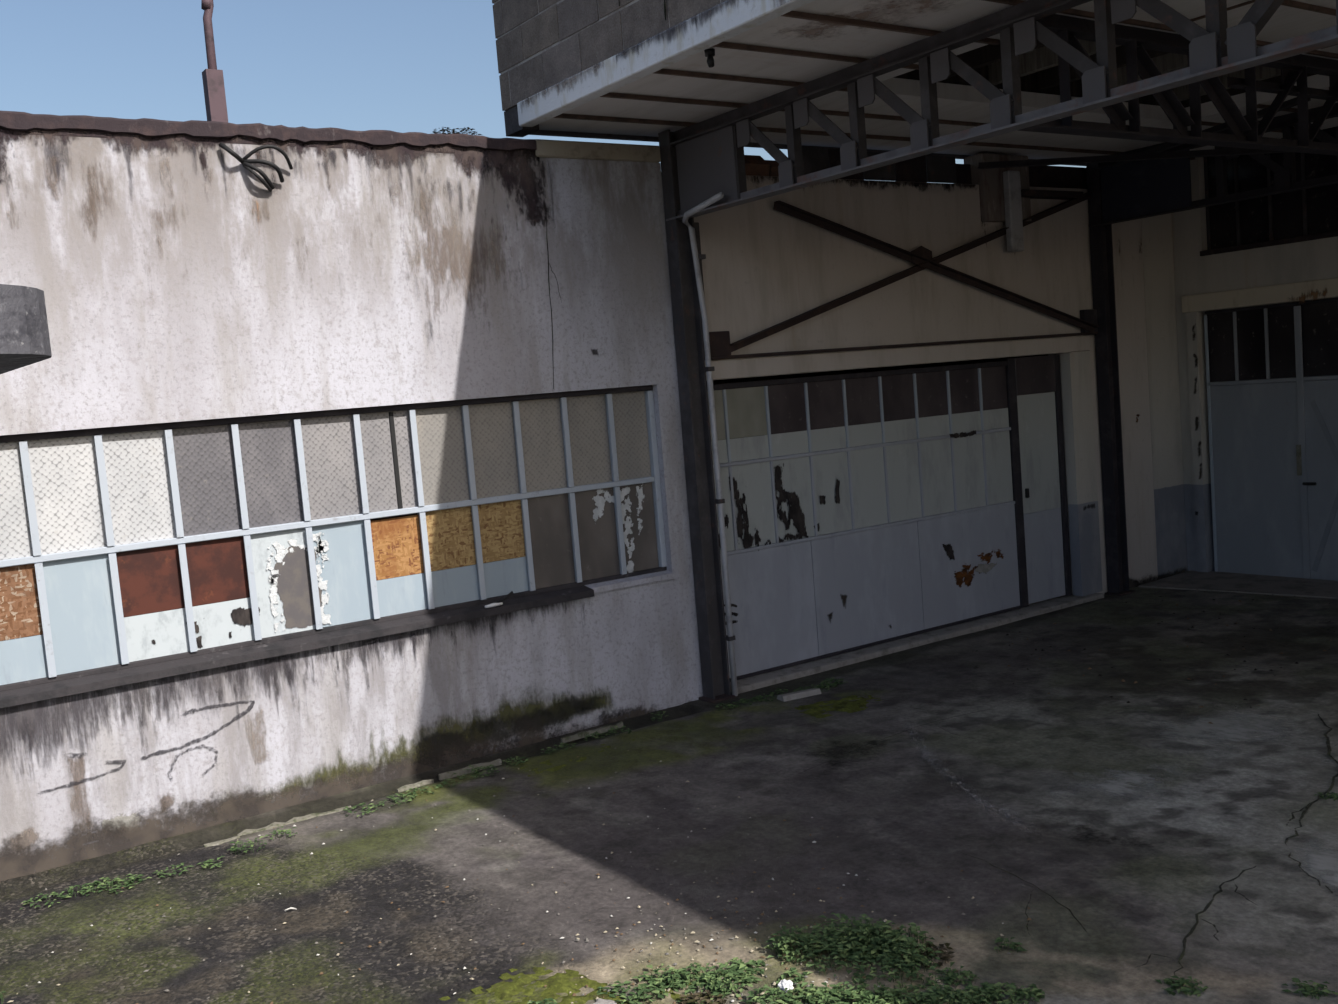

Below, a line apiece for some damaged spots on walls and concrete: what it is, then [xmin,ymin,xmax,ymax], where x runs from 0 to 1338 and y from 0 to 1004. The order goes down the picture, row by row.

leakage [616,0,735,57]
leakage [0,128,552,303]
peeling [229,532,331,638]
peeling [592,483,645,573]
peeling [718,463,820,551]
peeling [819,479,840,505]
rust [942,544,1004,588]
leakage [0,603,557,757]
leakage [0,692,659,882]
crack [1285,714,1338,893]
crack [1142,866,1257,976]